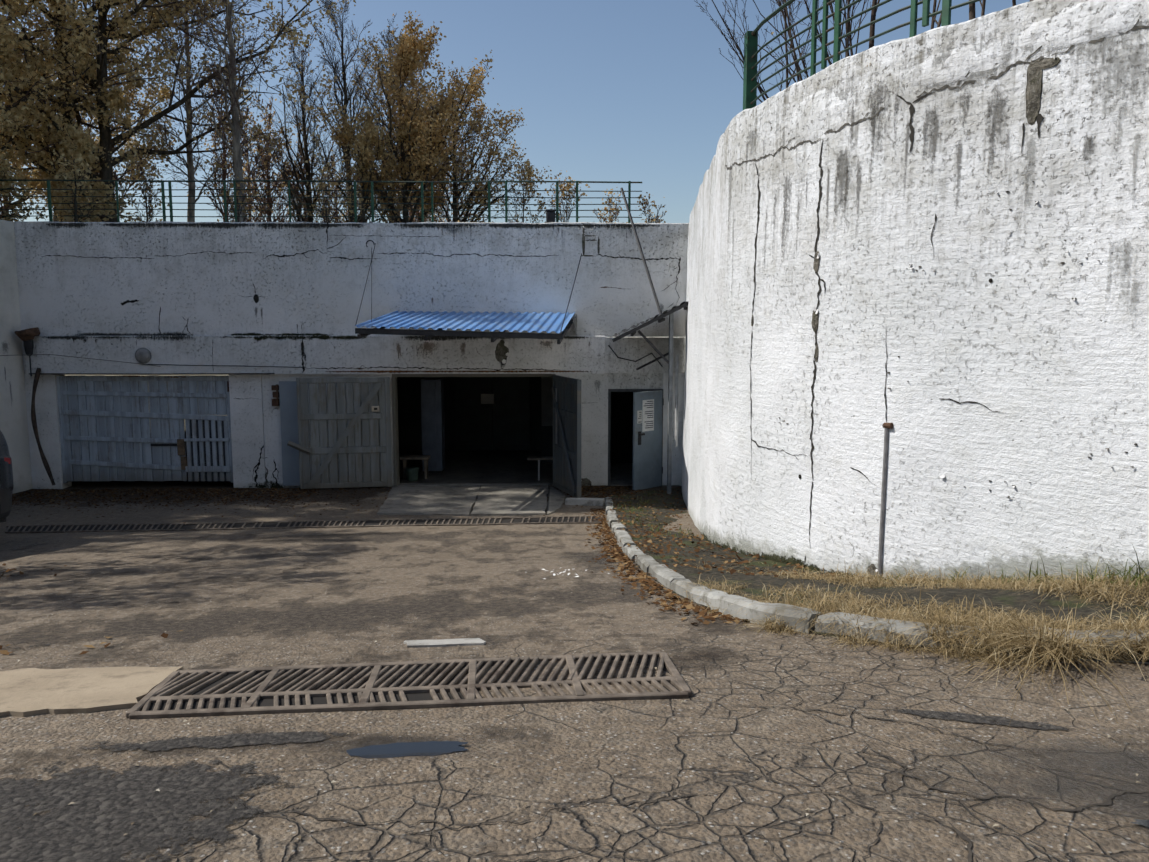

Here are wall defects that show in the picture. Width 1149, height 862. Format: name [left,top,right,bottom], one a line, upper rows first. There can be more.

damp [868,84,898,145]
damp [923,107,938,158]
damp [986,90,1009,171]
spalling [1025,55,1061,125]
damp [826,107,871,230]
crack [42,222,558,260]
damp [765,176,807,247]
crack [598,253,681,307]
crack [725,19,1149,564]
spalling [495,340,510,364]